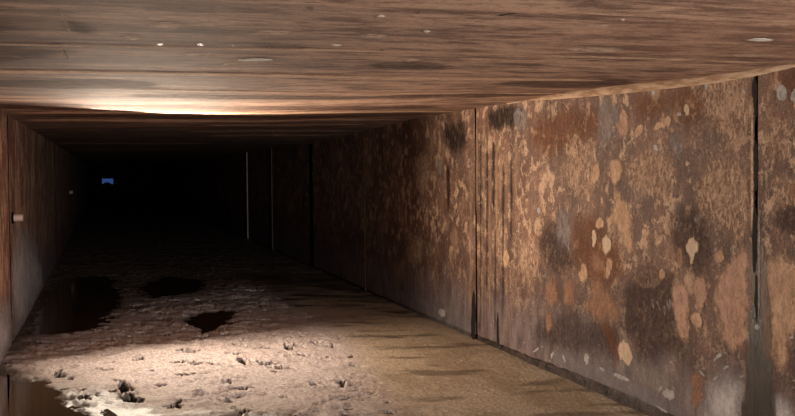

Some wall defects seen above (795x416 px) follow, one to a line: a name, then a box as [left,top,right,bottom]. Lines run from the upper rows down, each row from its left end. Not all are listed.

corrosion [575,220,618,282]
damp [705,244,791,416]